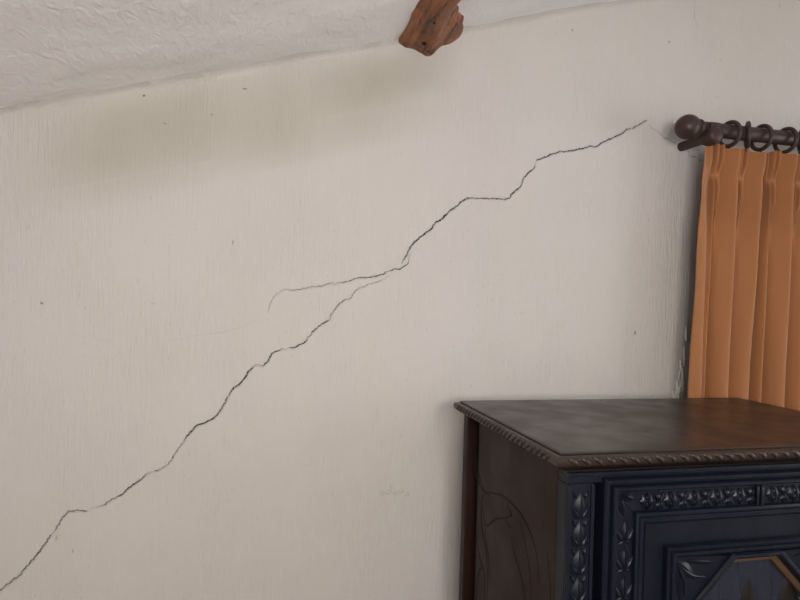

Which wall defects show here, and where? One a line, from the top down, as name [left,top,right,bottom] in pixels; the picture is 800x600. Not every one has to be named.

crack [0,121,646,592]